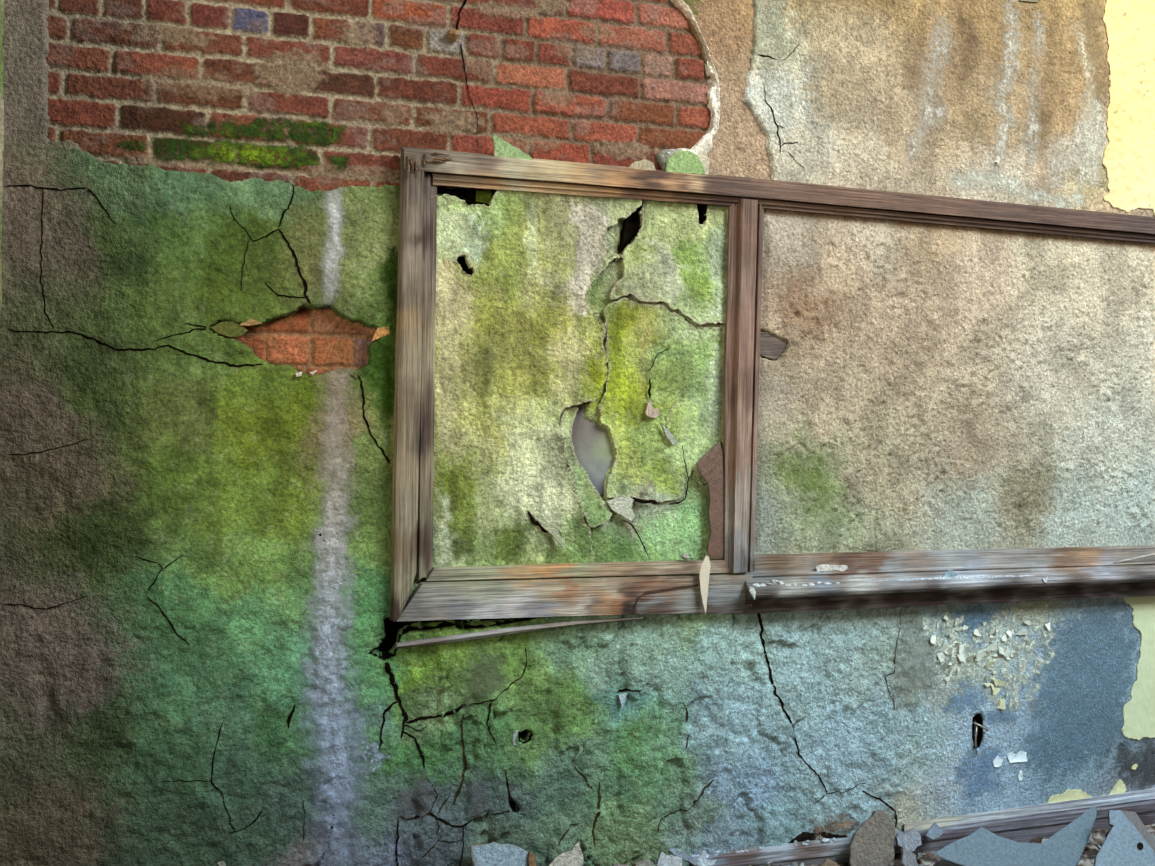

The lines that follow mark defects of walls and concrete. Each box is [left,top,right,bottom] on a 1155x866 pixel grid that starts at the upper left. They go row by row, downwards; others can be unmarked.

spalling [46,0,771,192]
crack [0,184,263,367]
crack [230,181,310,304]
damp [325,190,342,290]
peeling [422,172,728,578]
damp [306,370,390,866]
crack [378,648,528,866]
crack [558,766,601,849]
crack [757,613,898,827]
peeling [922,602,1055,712]
peeling [993,751,1027,781]
peeling [1047,779,1127,803]